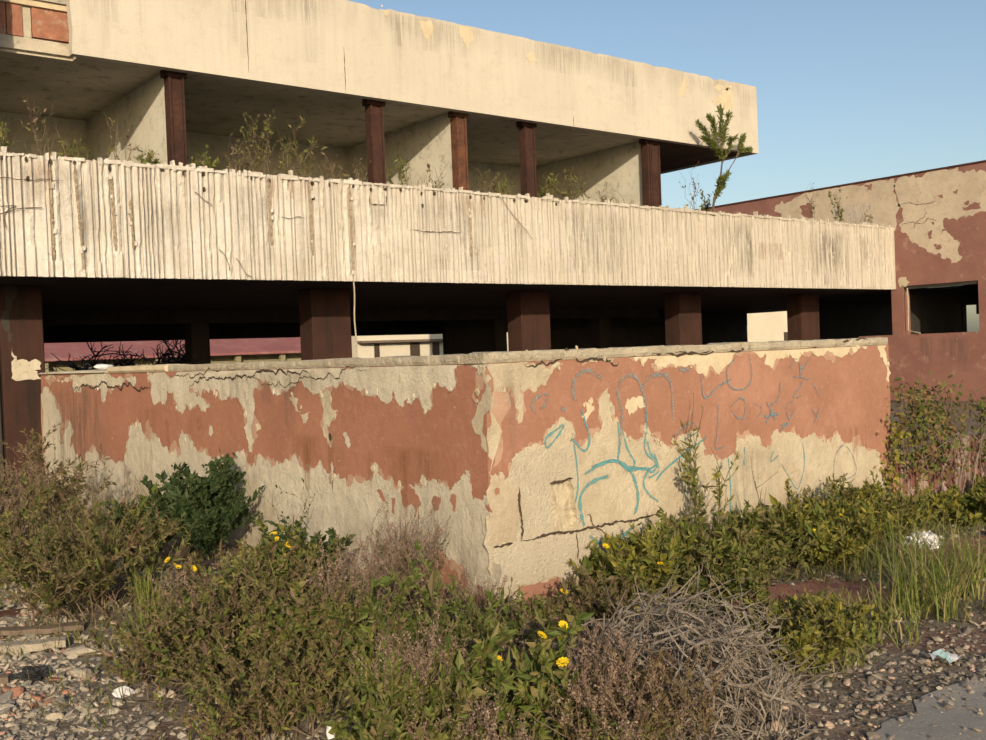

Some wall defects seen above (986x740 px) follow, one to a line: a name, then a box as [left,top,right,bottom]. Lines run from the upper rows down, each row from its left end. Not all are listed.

flaking render [459,26,474,49]
flaking render [774,167,986,263]
flaking render [1,285,892,619]
crack [494,488,660,560]